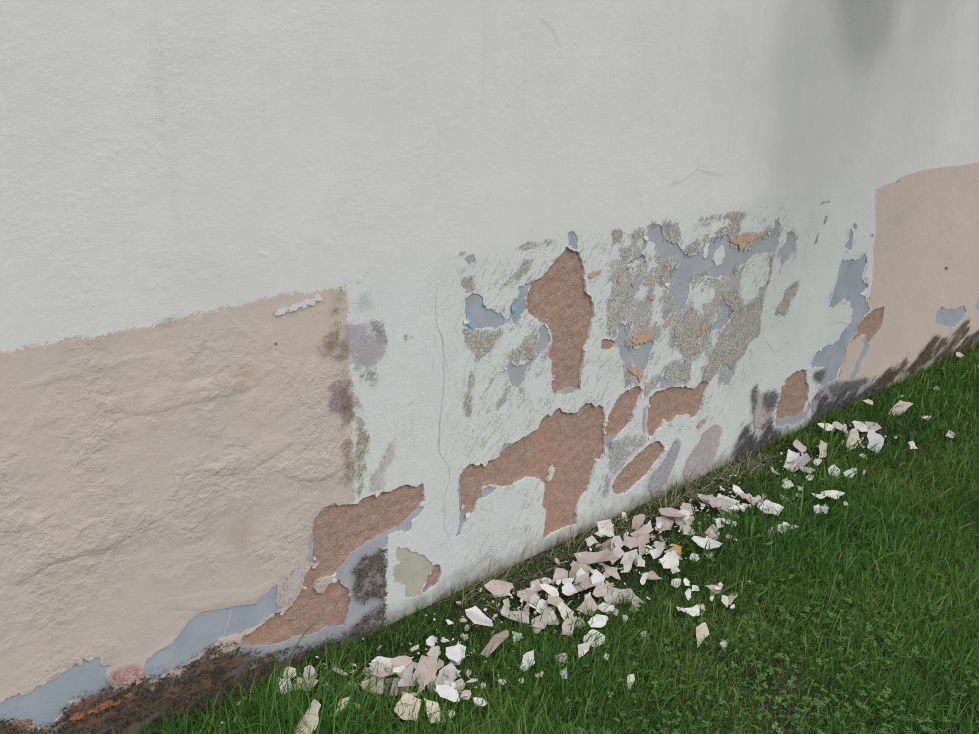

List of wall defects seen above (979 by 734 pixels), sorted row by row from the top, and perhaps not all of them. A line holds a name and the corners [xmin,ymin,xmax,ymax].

flaking render [456,214,798,538]
water stain [732,381,788,463]
peeling [775,224,883,428]
water stain [799,319,979,431]
peeling [936,300,979,328]
flaking render [144,484,424,678]
flaking render [422,564,440,592]
peeling [0,657,110,732]
water stain [0,548,388,734]